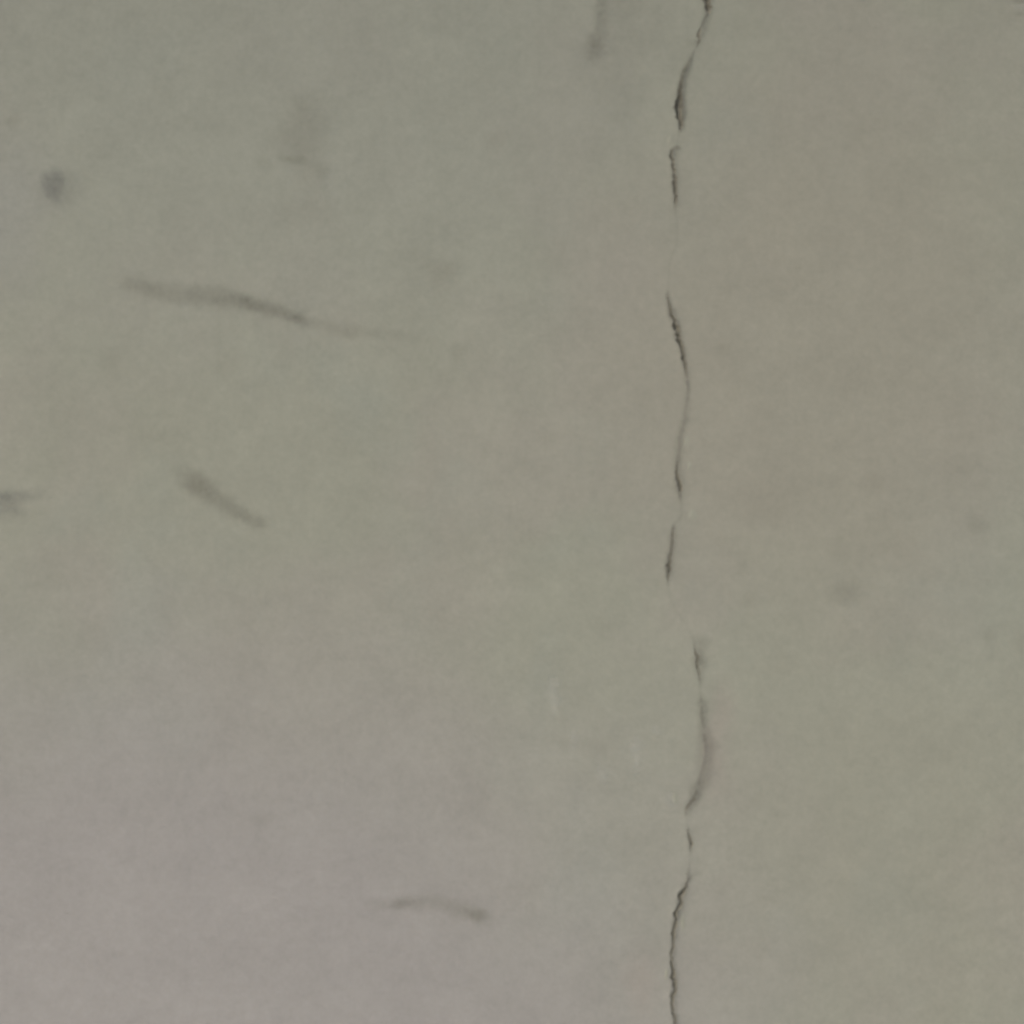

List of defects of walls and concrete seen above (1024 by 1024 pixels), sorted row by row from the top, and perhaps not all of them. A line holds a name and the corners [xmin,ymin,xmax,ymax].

crack [696,0,713,46]
crack [667,74,684,206]
crack [667,298,687,376]
crack [666,436,698,581]
crack [694,646,707,680]
crack [672,791,697,851]
crack [665,882,688,1024]